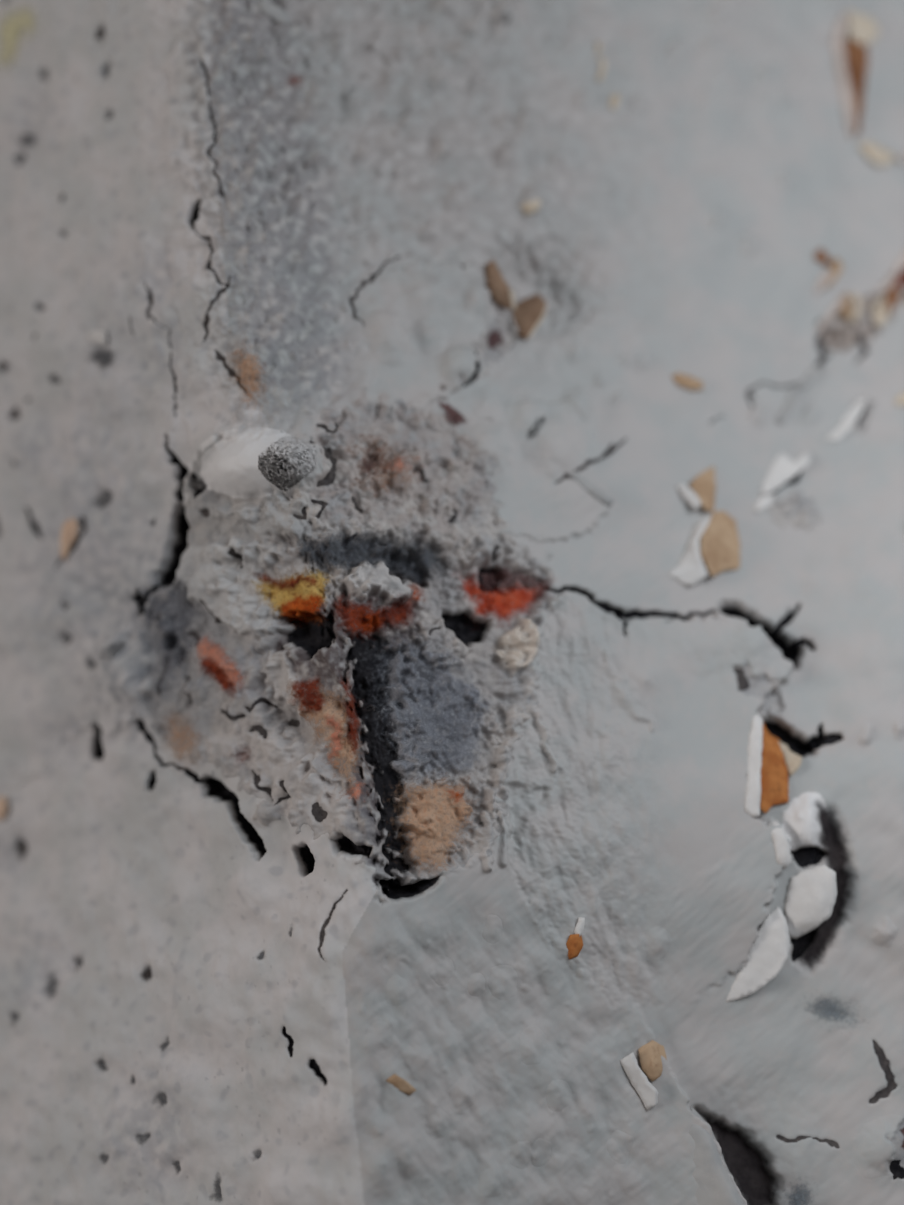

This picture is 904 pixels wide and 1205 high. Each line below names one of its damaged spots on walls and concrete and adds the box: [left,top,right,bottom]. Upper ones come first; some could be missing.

spalling [456,259,548,388]
crack [129,282,207,598]
peeling [669,466,740,586]
corrosion [258,570,419,635]
spalling [139,396,556,890]
corrosion [463,567,549,619]
crack [545,587,815,669]
crack [136,720,267,857]
corrosion [292,679,360,798]
peeling [726,663,837,1002]
crack [764,721,843,757]
peeling [689,1106,745,1205]